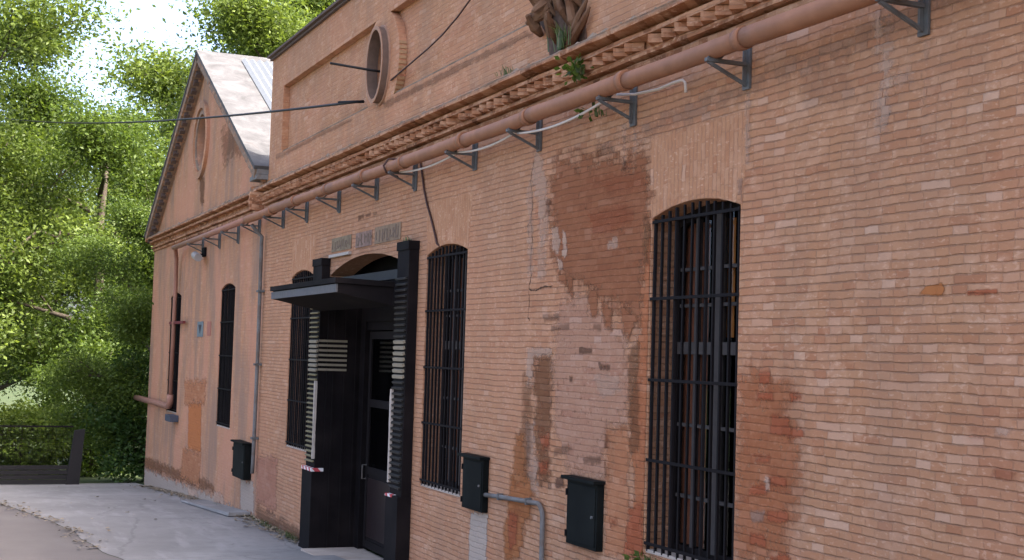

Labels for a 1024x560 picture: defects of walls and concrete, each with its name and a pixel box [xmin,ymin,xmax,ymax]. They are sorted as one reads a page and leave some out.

crack [527,162,553,321]
peeling [546,145,655,340]